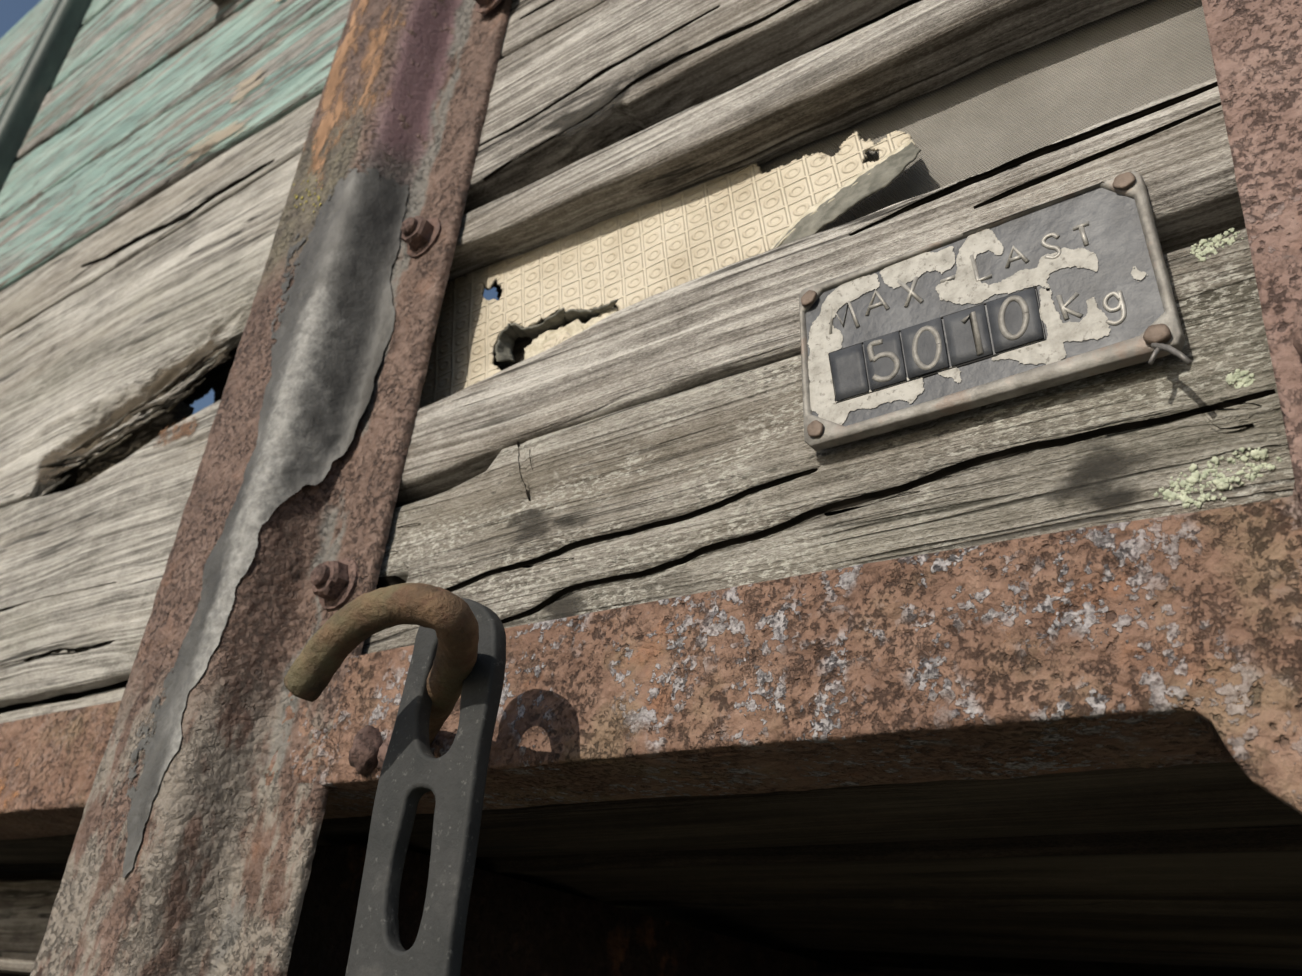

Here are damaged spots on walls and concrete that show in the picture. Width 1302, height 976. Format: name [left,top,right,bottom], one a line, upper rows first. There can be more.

peeling [167,70,265,169]
rust [304,0,406,187]
crack [479,0,801,181]
peeling [769,139,921,250]
rust [158,417,197,446]
peeling [122,162,409,878]
crack [376,523,421,589]
crack [446,389,1276,624]